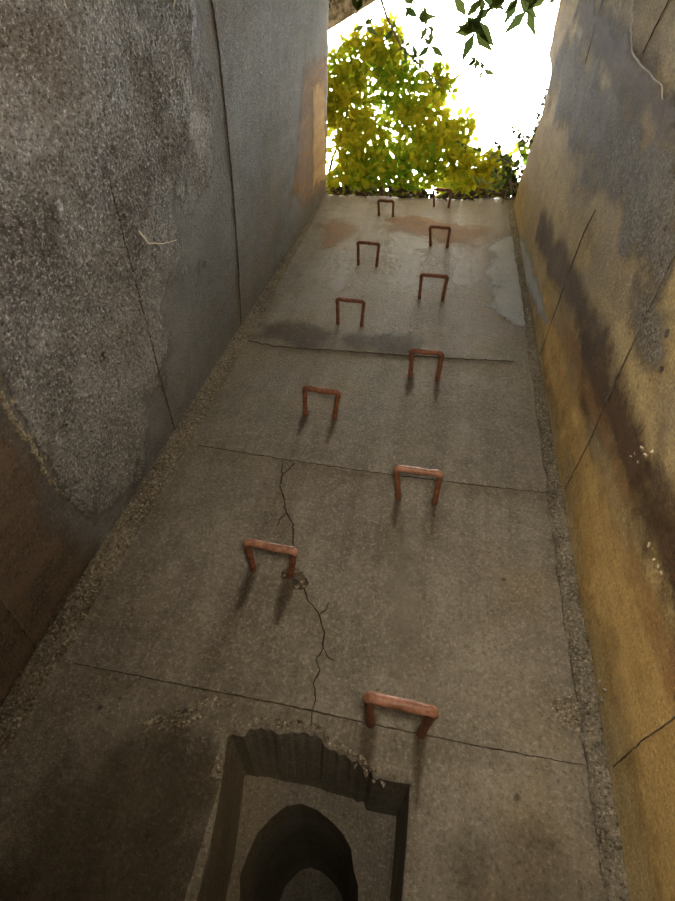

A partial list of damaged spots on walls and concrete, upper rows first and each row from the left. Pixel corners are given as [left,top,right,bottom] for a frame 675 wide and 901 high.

spalling [0,0,214,517]
damp [484,236,548,326]
damp [536,212,675,601]
spalling [230,715,386,788]
crack [73,580,585,766]